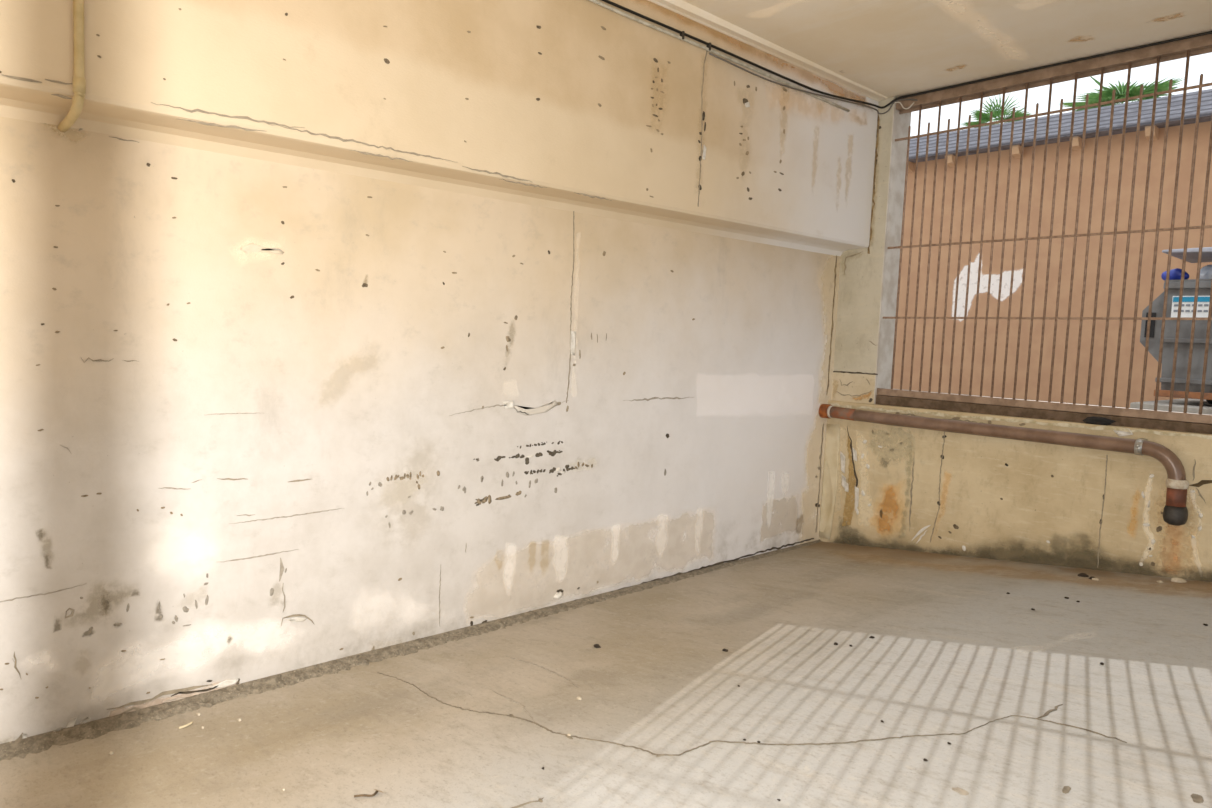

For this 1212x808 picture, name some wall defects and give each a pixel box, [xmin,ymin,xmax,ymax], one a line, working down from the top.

crack [698,51,707,207]
crack [826,114,881,395]
crack [611,424,824,592]
rust [879,489,897,531]
damp [834,474,1167,577]
damp [1182,490,1212,582]
crack [1189,461,1212,503]
crack [377,672,1127,757]